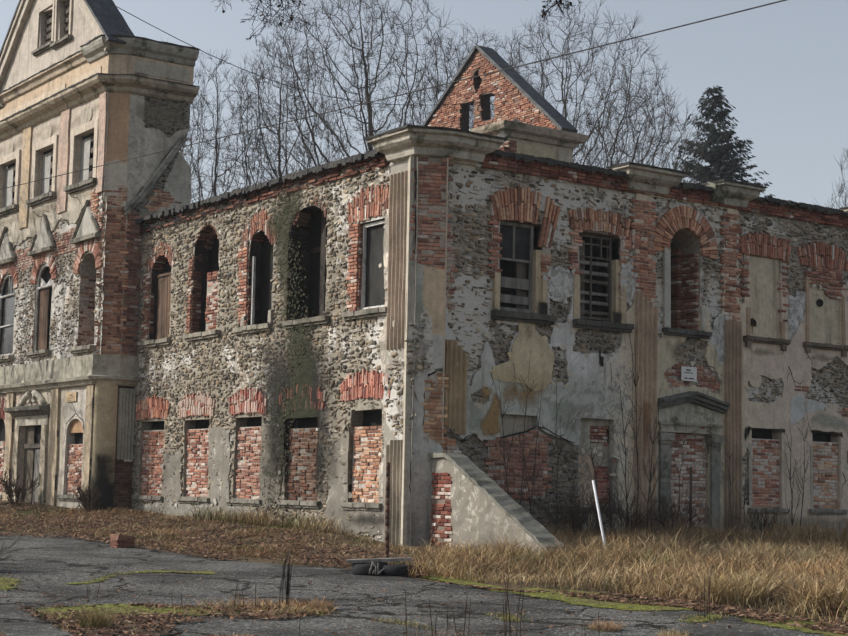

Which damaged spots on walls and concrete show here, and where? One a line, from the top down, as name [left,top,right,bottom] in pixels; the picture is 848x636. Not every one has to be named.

spalling [0,96,190,367]
peeling [325,422,384,535]
flaking render [430,472,453,547]
flaking render [377,209,622,535]
spalling [409,157,848,417]